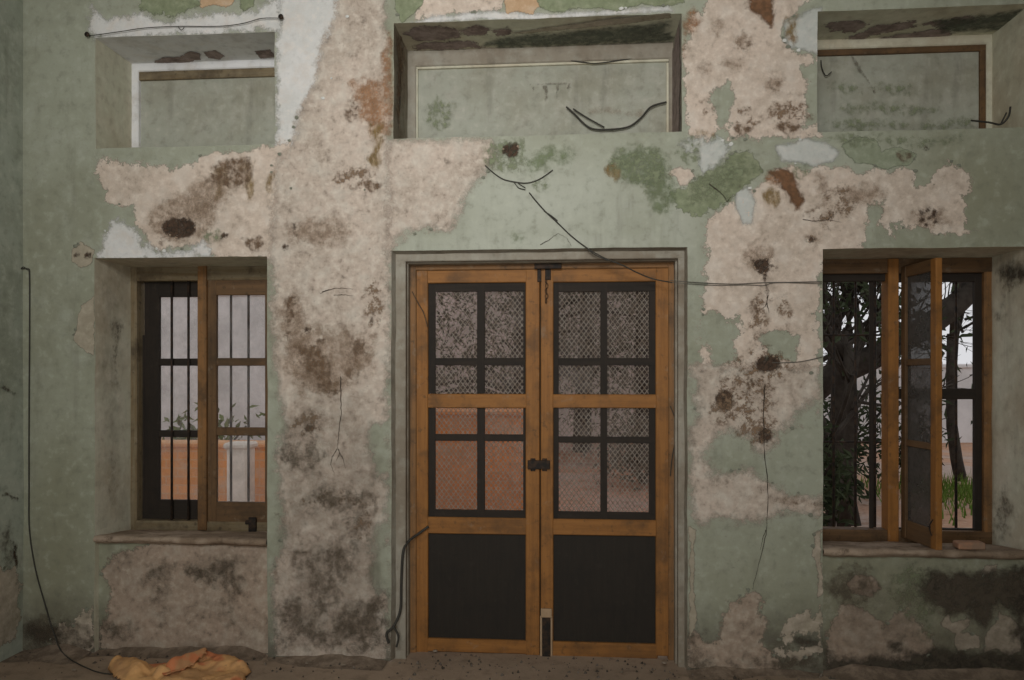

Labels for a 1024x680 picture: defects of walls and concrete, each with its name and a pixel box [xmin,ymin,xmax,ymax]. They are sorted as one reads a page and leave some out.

damp [484,24,673,48]
corrosion [750,0,774,28]
corrosion [345,37,405,165]
damp [605,145,674,213]
corrosion [763,168,807,209]
peeling [49,0,524,659]
damp [283,297,370,395]
peeling [403,0,1021,669]
crack [330,376,345,472]
damp [709,377,777,444]
crack [753,385,768,587]
damp [826,567,1024,671]